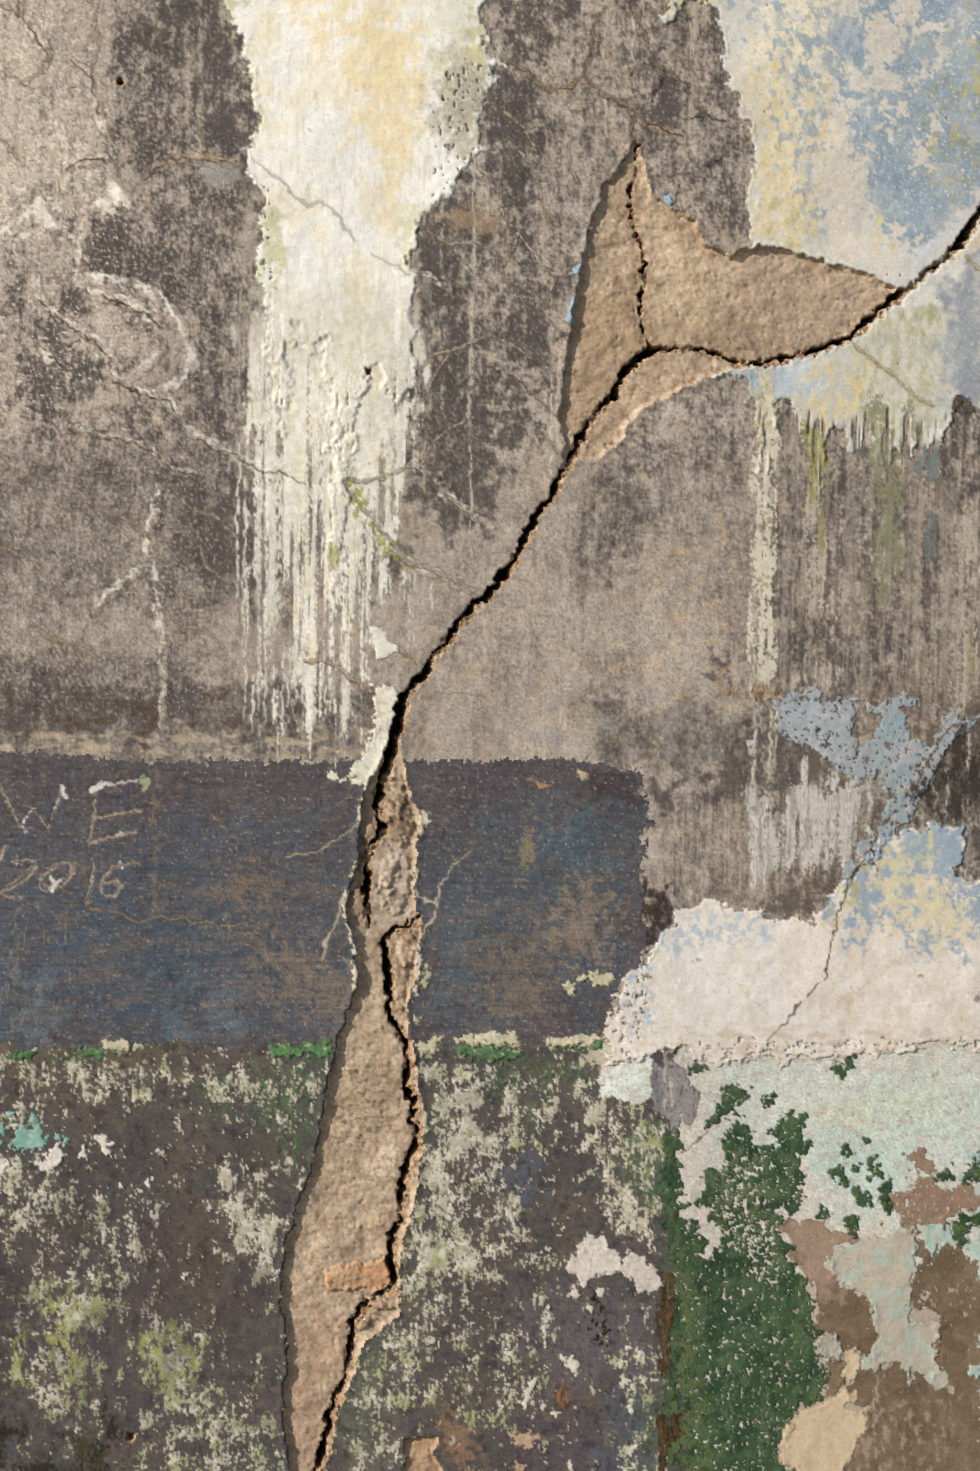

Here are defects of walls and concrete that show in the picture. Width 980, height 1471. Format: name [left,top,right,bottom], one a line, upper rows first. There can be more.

crack [68,429,287,583]
crack [89,908,269,926]
crack [149,157,409,275]
peeling [224,0,508,450]
flaking render [268,683,527,1471]
leakage [467,296,475,421]
crack [292,0,980,1471]
leakage [689,3,699,59]
peeling [540,686,980,1471]
peeling [558,0,980,496]
leakage [738,368,886,893]
leakage [910,513,980,829]